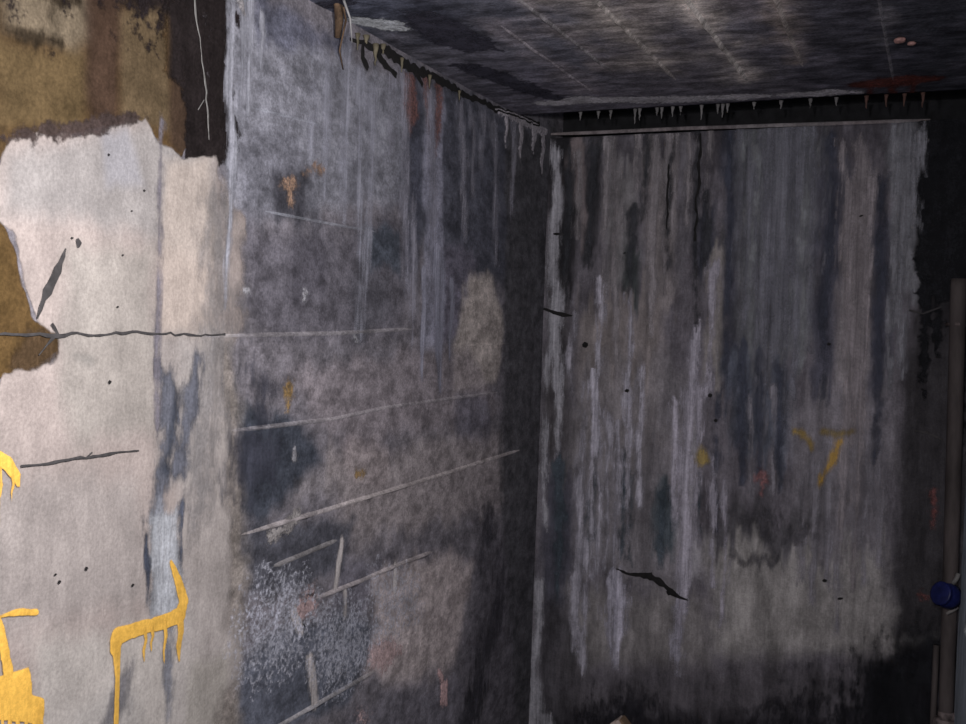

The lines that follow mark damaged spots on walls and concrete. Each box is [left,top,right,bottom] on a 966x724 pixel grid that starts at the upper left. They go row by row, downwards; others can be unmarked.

damp [0,0,265,276]
damp [0,222,59,379]
crack [0,238,226,356]
crack [21,450,139,468]
peeling [0,119,250,724]
damp [144,277,201,616]
damp [495,108,927,675]
damp [106,670,130,724]
damp [305,653,317,709]
damp [333,537,347,619]
damp [529,579,552,724]
crack [616,568,688,601]